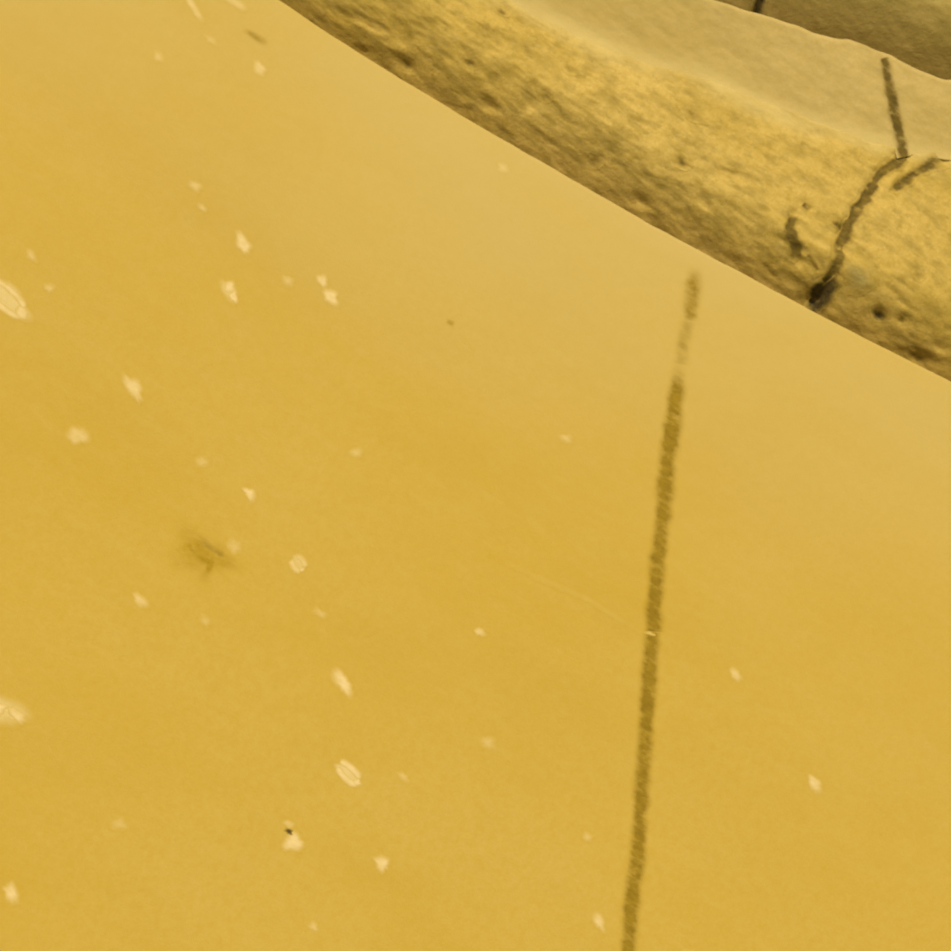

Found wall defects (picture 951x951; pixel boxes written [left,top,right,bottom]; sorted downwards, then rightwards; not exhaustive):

crack [749,0,768,15]
crack [781,56,948,315]
peeling [234,227,255,257]
peeling [0,277,36,324]
peeling [216,275,240,306]
peeling [315,272,341,309]
crack [617,263,705,951]
peeling [328,664,355,701]
peeling [0,691,39,731]
peeling [333,758,364,788]
peeling [280,818,306,854]